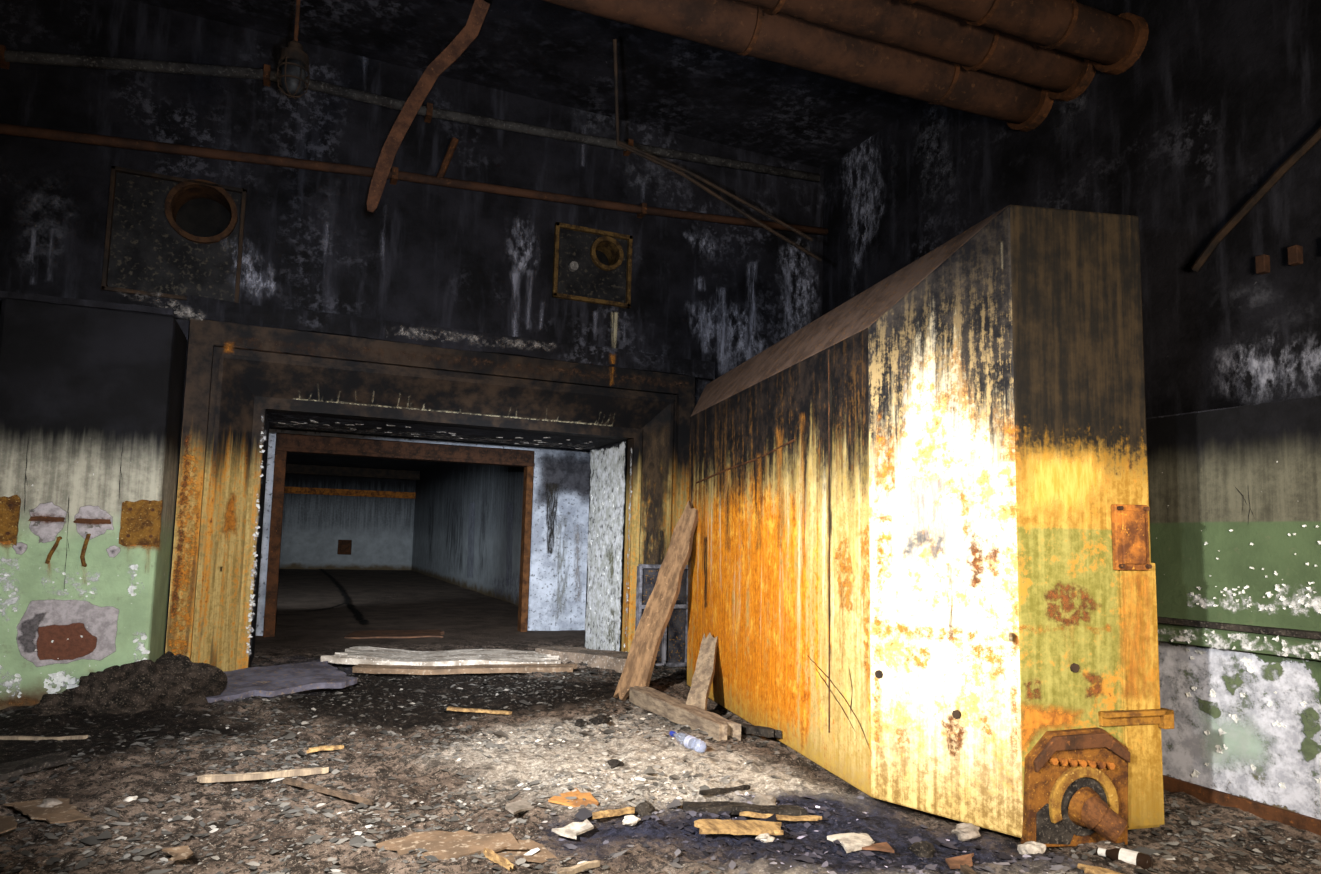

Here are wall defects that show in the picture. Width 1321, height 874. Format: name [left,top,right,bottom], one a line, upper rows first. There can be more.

leakage [844,138,882,265]
leakage [693,263,762,367]
leakage [1223,351,1321,389]
rust [876,416,895,501]
rust [1003,426,1102,510]
spalling [0,502,120,698]
rust [168,436,200,655]
leakage [546,483,581,618]
rust [835,516,1096,768]
rust [960,492,999,588]
peeling [1188,553,1321,614]
peeling [1158,630,1321,820]